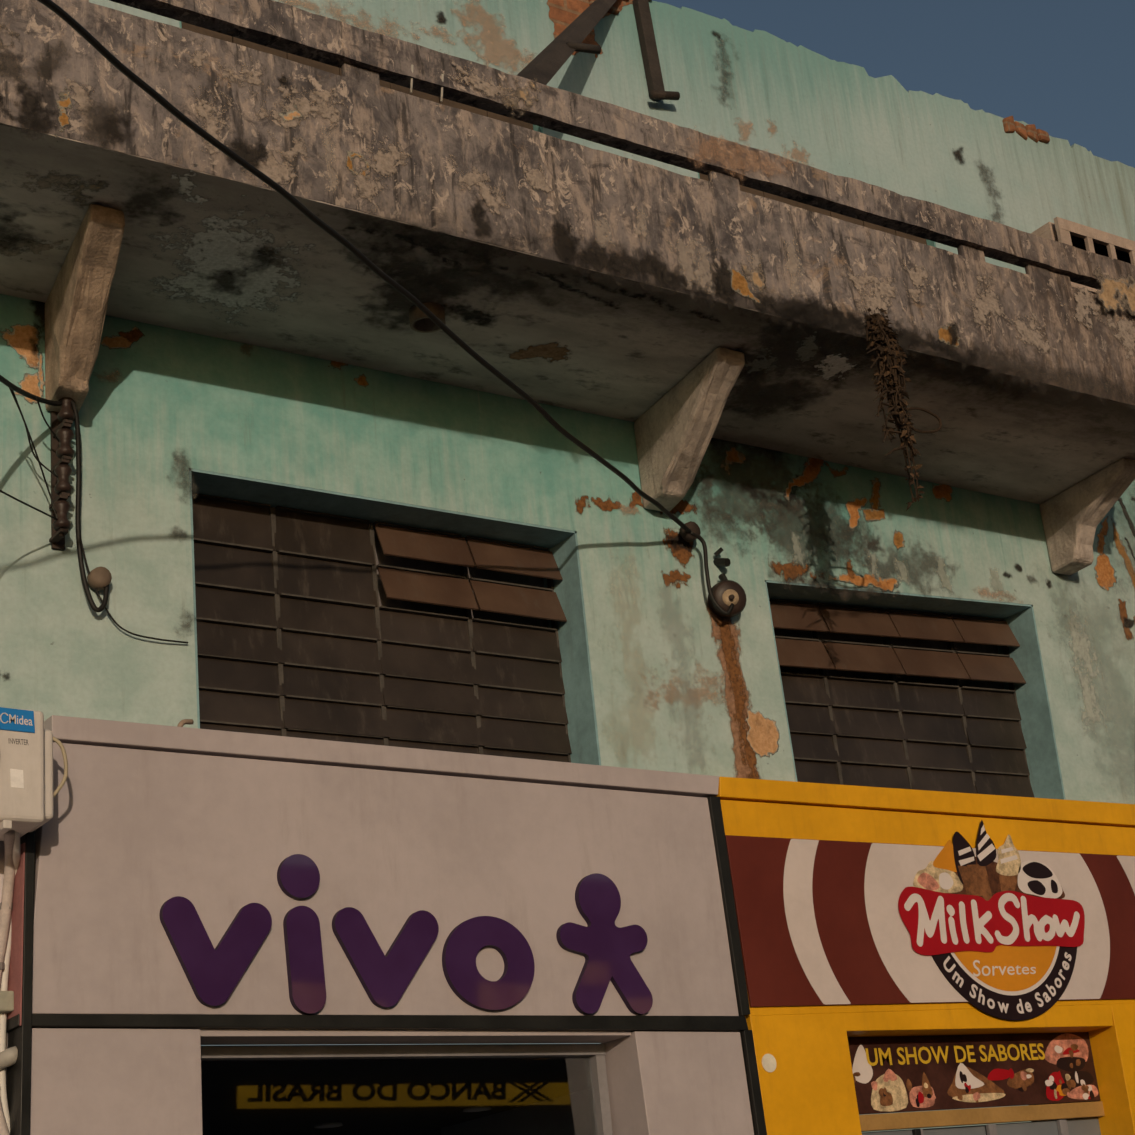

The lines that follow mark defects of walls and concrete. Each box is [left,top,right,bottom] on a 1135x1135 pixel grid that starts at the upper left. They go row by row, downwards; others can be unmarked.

flaking render [547,0,595,39]
damp [0,41,66,138]
damp [86,105,128,148]
damp [553,220,736,308]
peeling [0,324,45,404]
damp [724,243,1135,418]
peeling [575,492,643,514]
spalling [662,528,694,588]
damp [691,438,953,591]
peeling [845,478,885,529]
peeling [1094,516,1135,591]
corrosion [707,602,759,779]